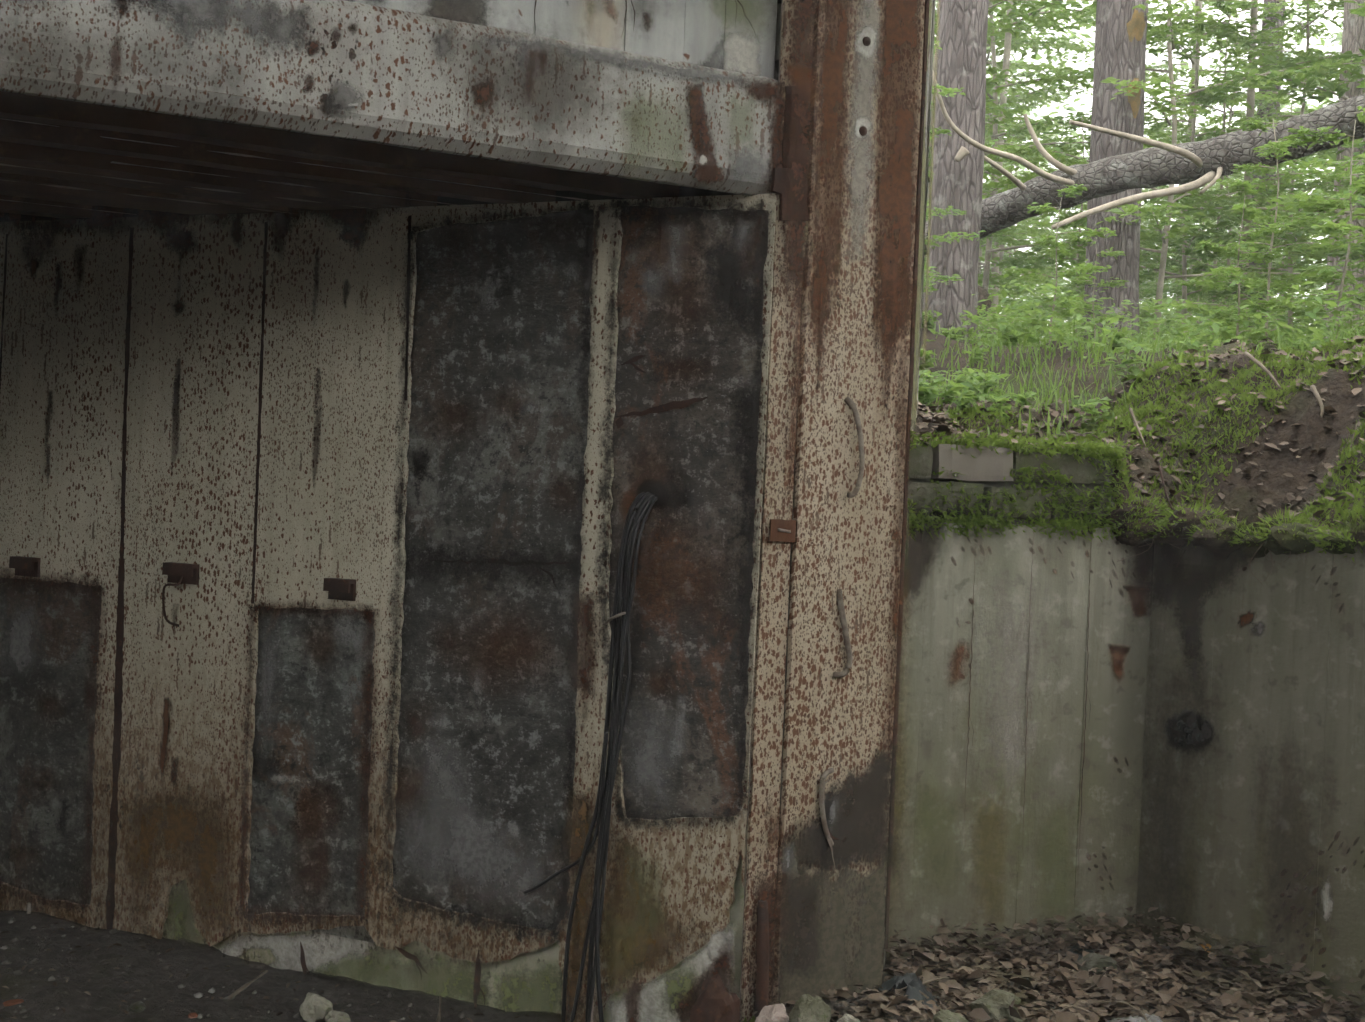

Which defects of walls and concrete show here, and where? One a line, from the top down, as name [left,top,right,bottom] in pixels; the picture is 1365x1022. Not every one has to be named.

corrosion [111,37,120,80]
leakage [111,0,308,48]
corrosion [45,391,53,479]
corrosion [171,358,181,471]
corrosion [238,0,852,1022]
leakage [903,509,944,598]
corrosion [1108,531,1150,617]
leakage [1130,541,1251,682]
corrosion [1109,645,1128,680]
corrosion [0,568,114,911]
corrosion [159,698,178,788]
leakage [787,746,903,880]